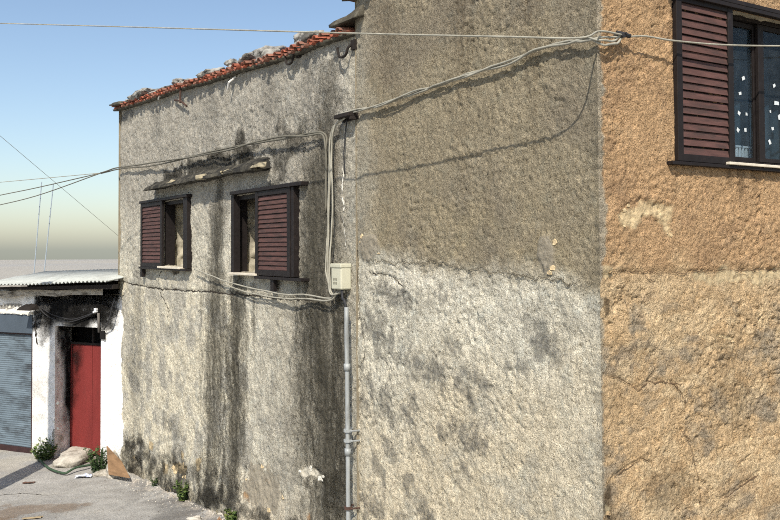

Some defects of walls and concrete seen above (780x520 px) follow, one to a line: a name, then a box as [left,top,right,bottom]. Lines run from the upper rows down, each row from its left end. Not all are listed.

damp [163,131,259,181]
damp [269,126,306,185]
damp [296,113,346,520]
damp [122,186,270,520]
flaking render [298,465,325,481]